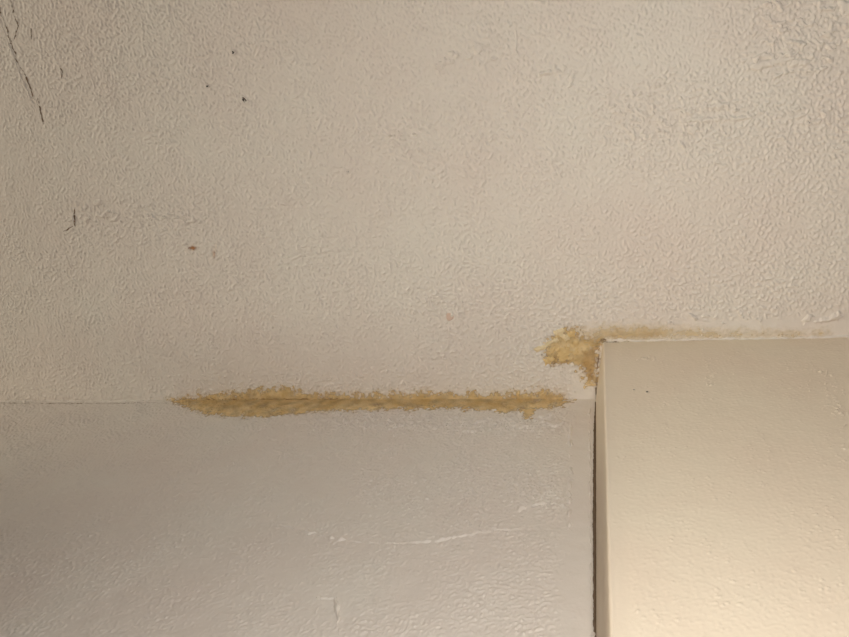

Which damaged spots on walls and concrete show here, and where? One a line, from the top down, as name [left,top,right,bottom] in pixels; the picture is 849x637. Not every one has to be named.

crack [0,3,44,122]
damp [526,327,667,389]
damp [166,386,577,420]